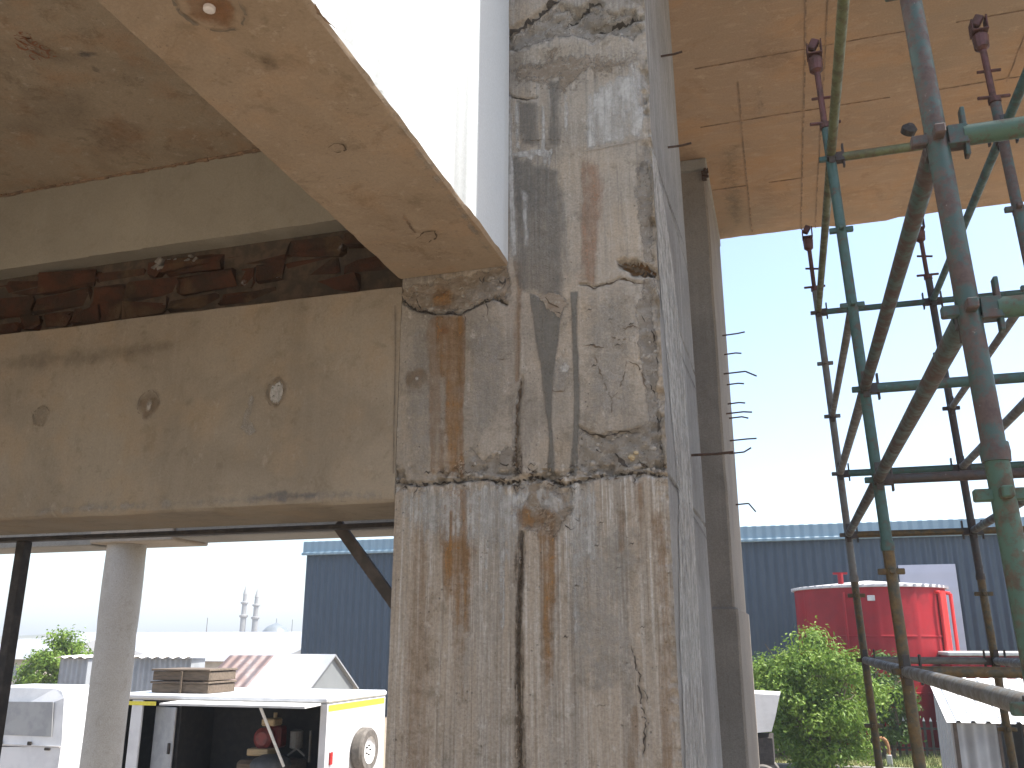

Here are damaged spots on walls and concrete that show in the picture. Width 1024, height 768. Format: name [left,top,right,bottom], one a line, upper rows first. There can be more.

spalling [509,0,641,52]
spalling [402,266,510,314]
water stain [508,99,596,632]
crack [579,325,646,438]
spalling [577,160,665,477]
crack [585,271,701,401]
corrosion [436,316,471,622]
spalling [455,446,580,537]
crack [398,463,711,547]
corrosion [540,509,555,670]
crack [630,646,648,753]